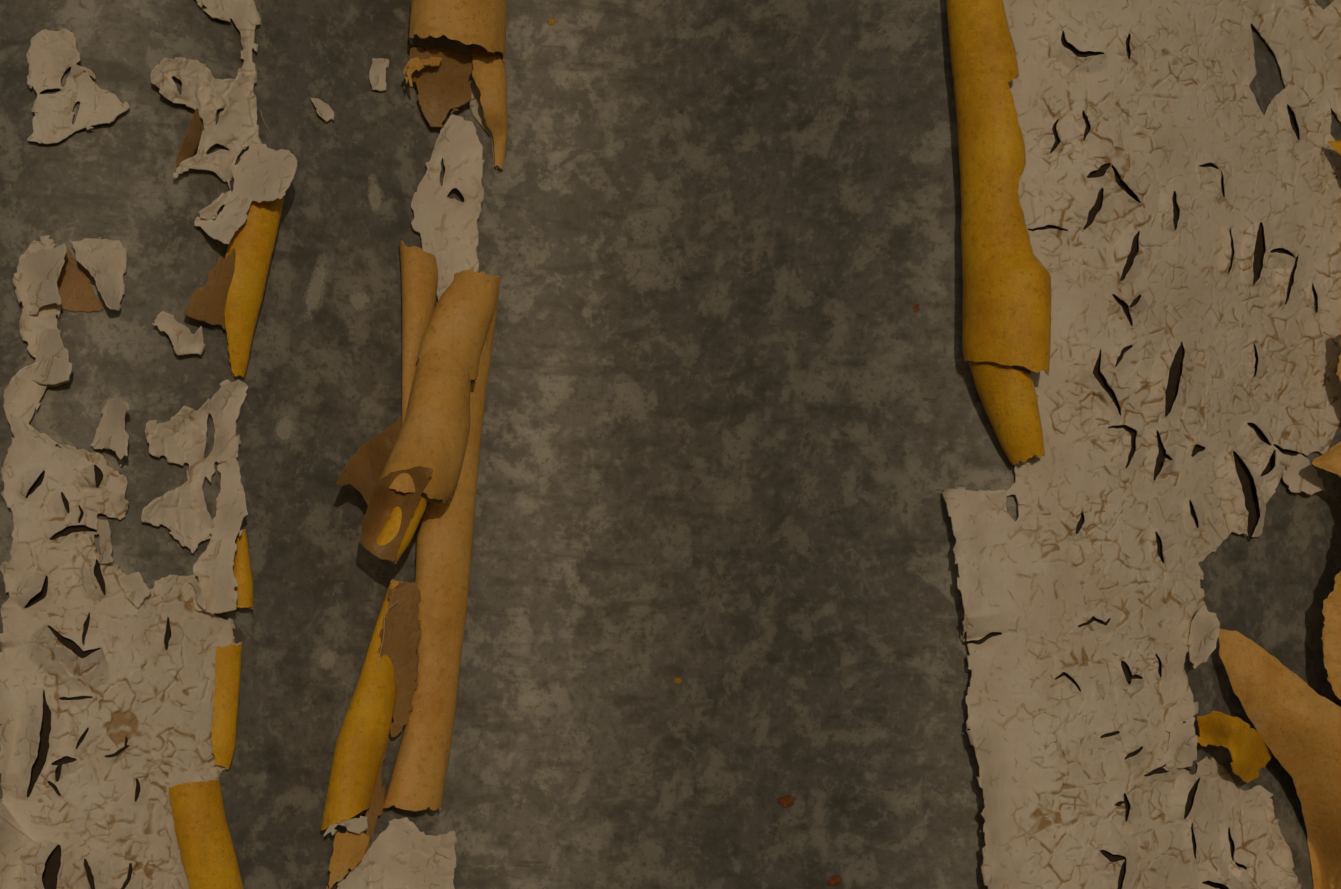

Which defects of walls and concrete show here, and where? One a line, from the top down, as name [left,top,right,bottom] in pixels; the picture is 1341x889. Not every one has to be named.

peeling [26,29,130,144]
peeling [369,58,390,92]
peeling [18,237,128,315]
peeling [151,0,297,356]
peeling [402,114,499,300]
peeling [141,373,248,553]
crack [942,0,1341,889]
crack [0,235,248,889]
peeling [378,561,422,737]
peeling [322,805,457,889]